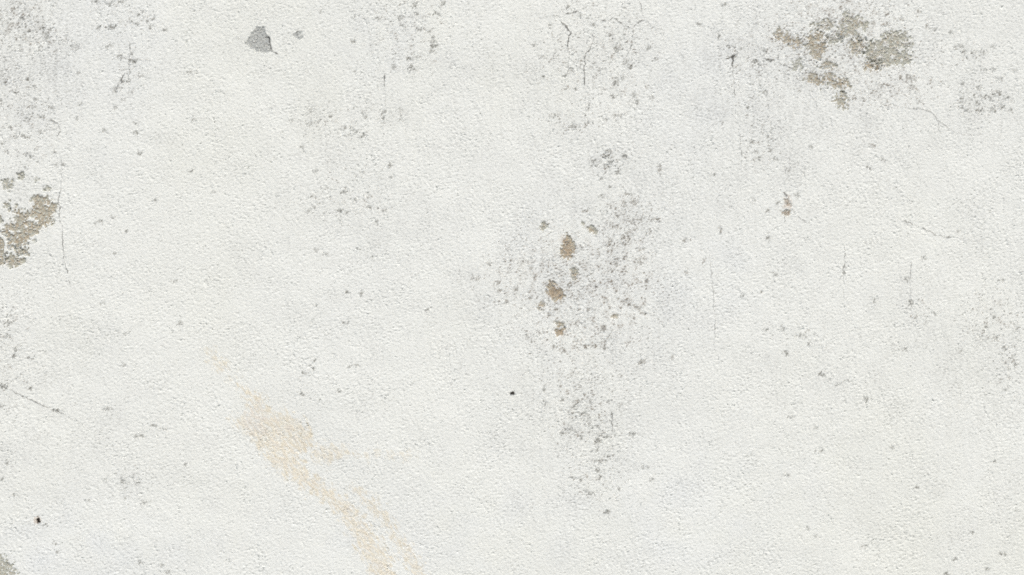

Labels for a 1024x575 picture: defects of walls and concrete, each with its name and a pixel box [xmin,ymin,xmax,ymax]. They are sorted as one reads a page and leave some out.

spalling [245,27,278,54]
peeling [773,10,915,110]
peeling [0,172,58,269]
spalling [560,232,579,280]
spalling [538,280,566,309]